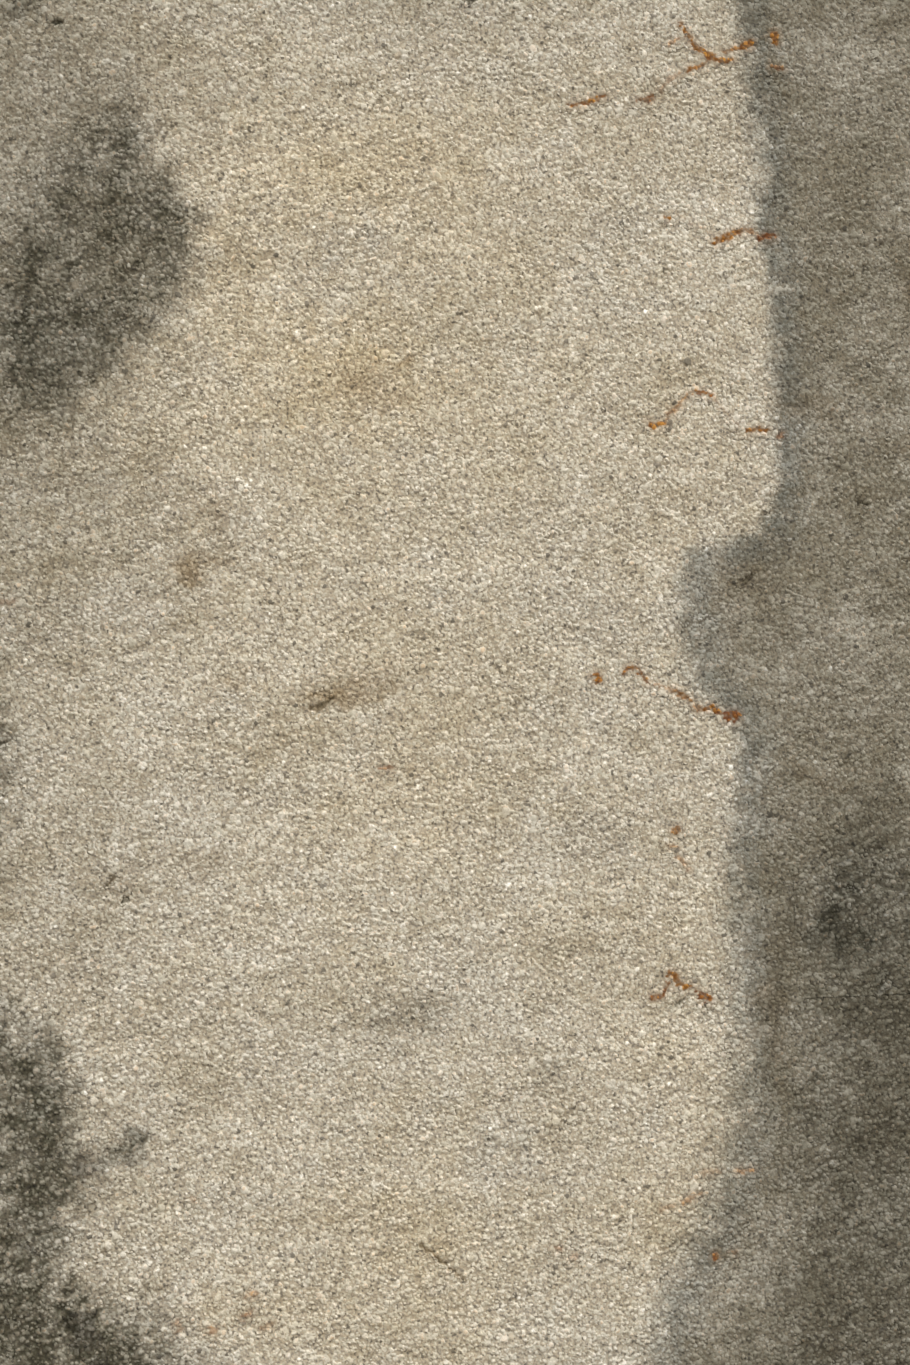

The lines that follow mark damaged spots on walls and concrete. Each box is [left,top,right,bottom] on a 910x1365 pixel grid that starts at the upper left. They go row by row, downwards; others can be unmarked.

rust [628,15,793,111]
rust [559,87,614,114]
rust [657,207,783,253]
leakage [0,0,252,595]
rust [639,384,791,446]
leakage [195,662,270,709]
rust [586,657,747,730]
leakage [0,619,37,948]
leakage [85,838,237,921]
rust [641,963,720,1010]
leakage [0,974,258,1365]